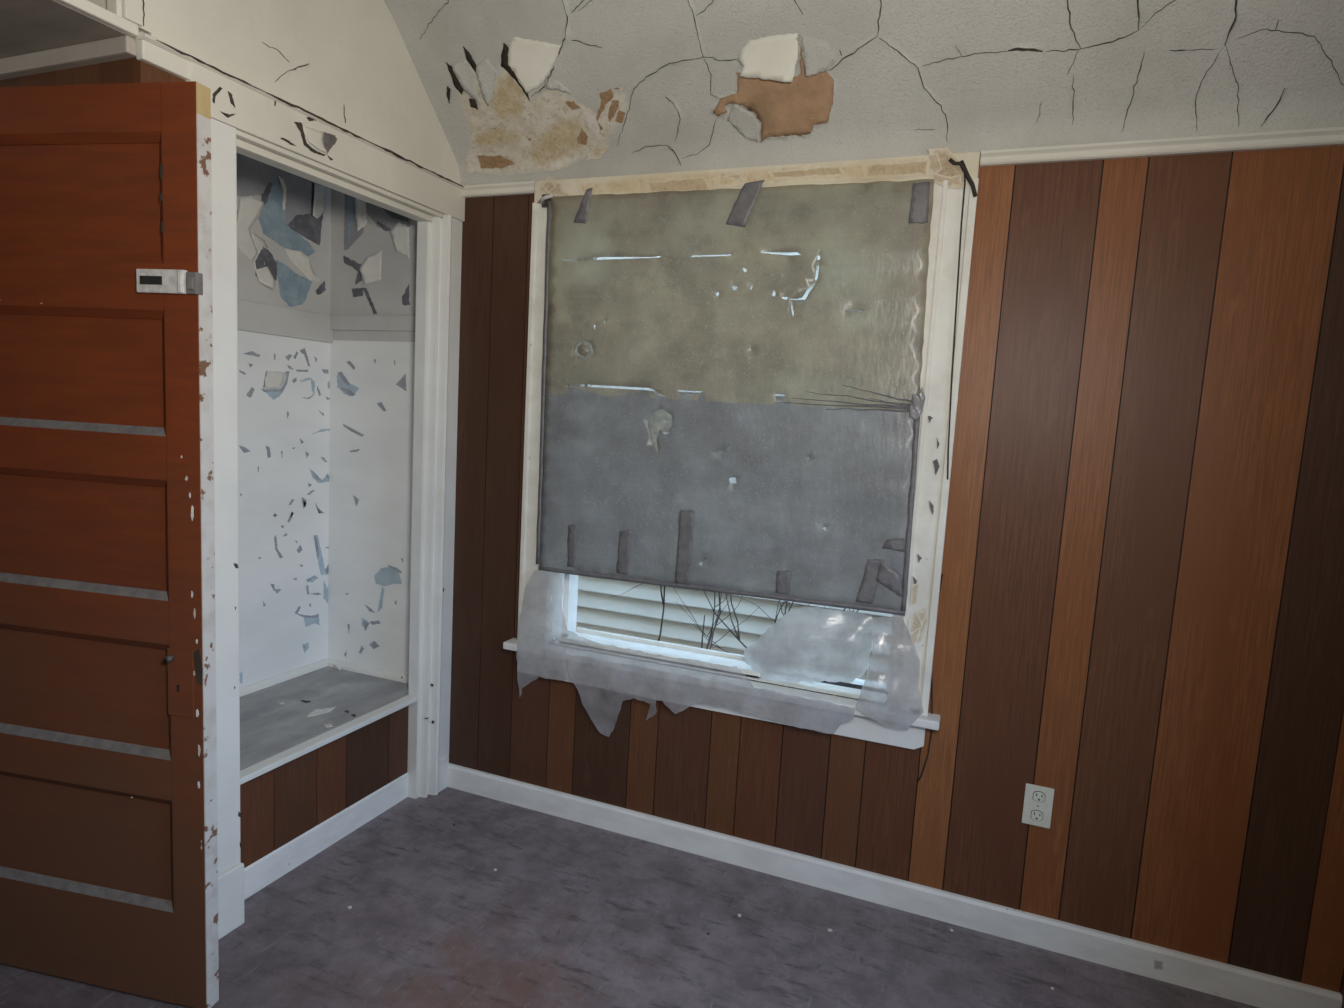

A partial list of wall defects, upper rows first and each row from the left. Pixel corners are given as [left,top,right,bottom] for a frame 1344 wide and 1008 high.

peeling [212,87,235,118]
crack [142,0,464,187]
peeling [280,117,337,160]
crack [531,0,602,100]
crack [617,0,737,168]
peeling [707,33,838,145]
crack [828,0,1344,141]
peeling [236,153,326,307]
peeling [343,194,410,314]
spalling [239,348,364,626]
spalling [344,558,403,657]